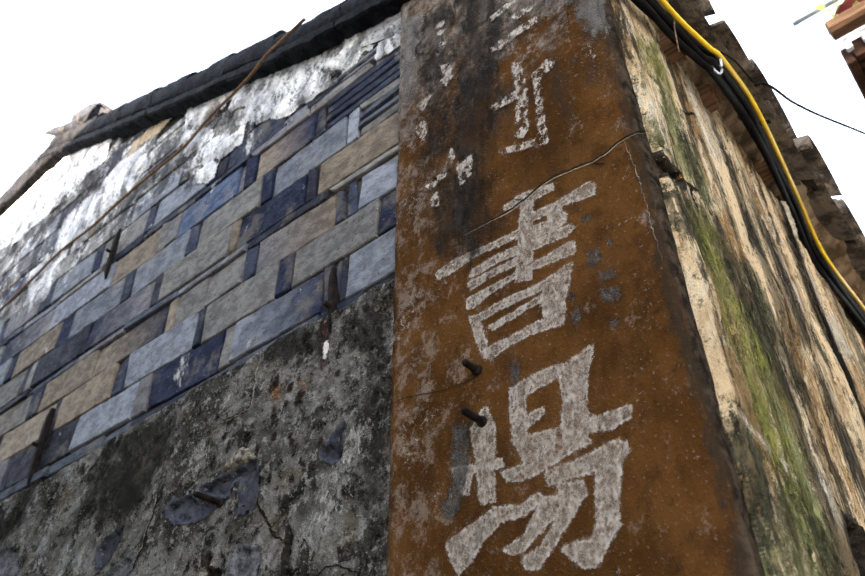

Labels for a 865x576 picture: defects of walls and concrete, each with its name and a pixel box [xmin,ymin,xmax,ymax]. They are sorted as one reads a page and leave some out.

peeling [566,0,613,40]
flaking render [179,11,422,185]
water stain [631,35,865,576]
rust [316,319,329,370]
spalling [268,374,304,442]
water stain [0,419,54,545]
water stain [80,406,177,537]
flaking render [164,431,295,527]
flaking render [308,418,349,491]
flaking render [183,533,262,576]
spalling [280,525,311,576]
flaking render [840,509,865,576]